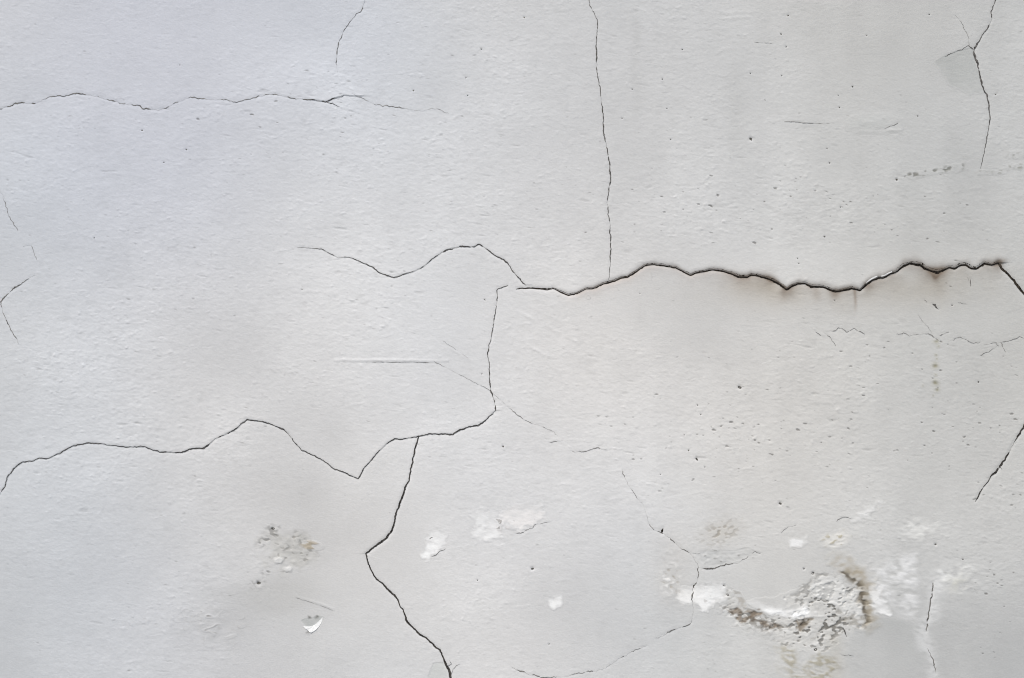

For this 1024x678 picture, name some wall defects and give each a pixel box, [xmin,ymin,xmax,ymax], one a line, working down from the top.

crack [349,0,1024,296]
crack [0,199,37,339]
leakage [620,263,1024,328]
crack [1,285,557,678]
spalling [251,521,329,584]
peeling [300,613,326,635]
flaking render [419,530,449,563]
flaking render [467,499,549,546]
crack [622,473,757,633]
spalling [675,511,997,678]
crack [926,583,936,672]
crack [975,424,1024,502]